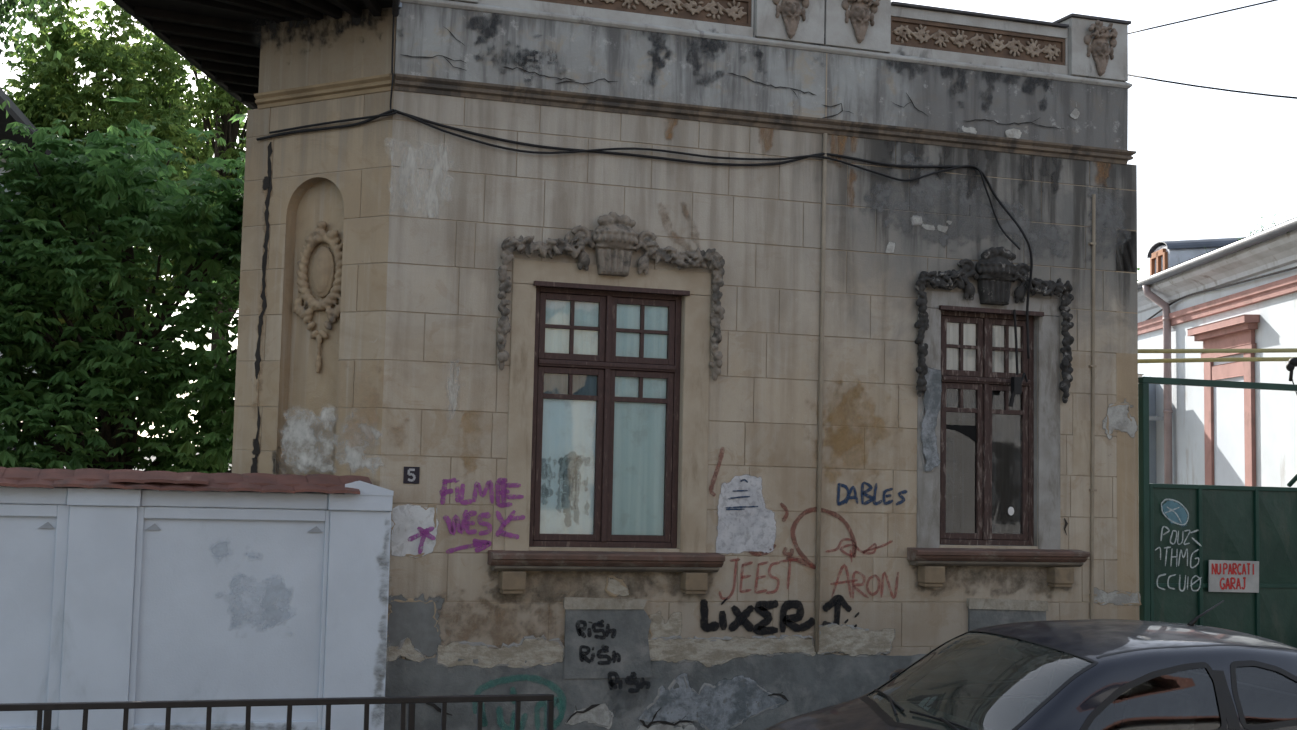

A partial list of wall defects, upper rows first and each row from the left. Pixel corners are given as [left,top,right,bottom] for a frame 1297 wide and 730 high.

crack [404,26,467,71]
water stain [469,13,556,82]
crack [504,67,617,89]
water stain [643,31,670,85]
water stain [686,37,726,84]
water stain [982,71,1049,110]
water stain [864,140,1068,257]
crack [251,142,272,473]
peeling [1102,401,1138,439]
peeling [386,598,565,669]
peeling [636,611,895,730]
peeling [565,703,614,730]